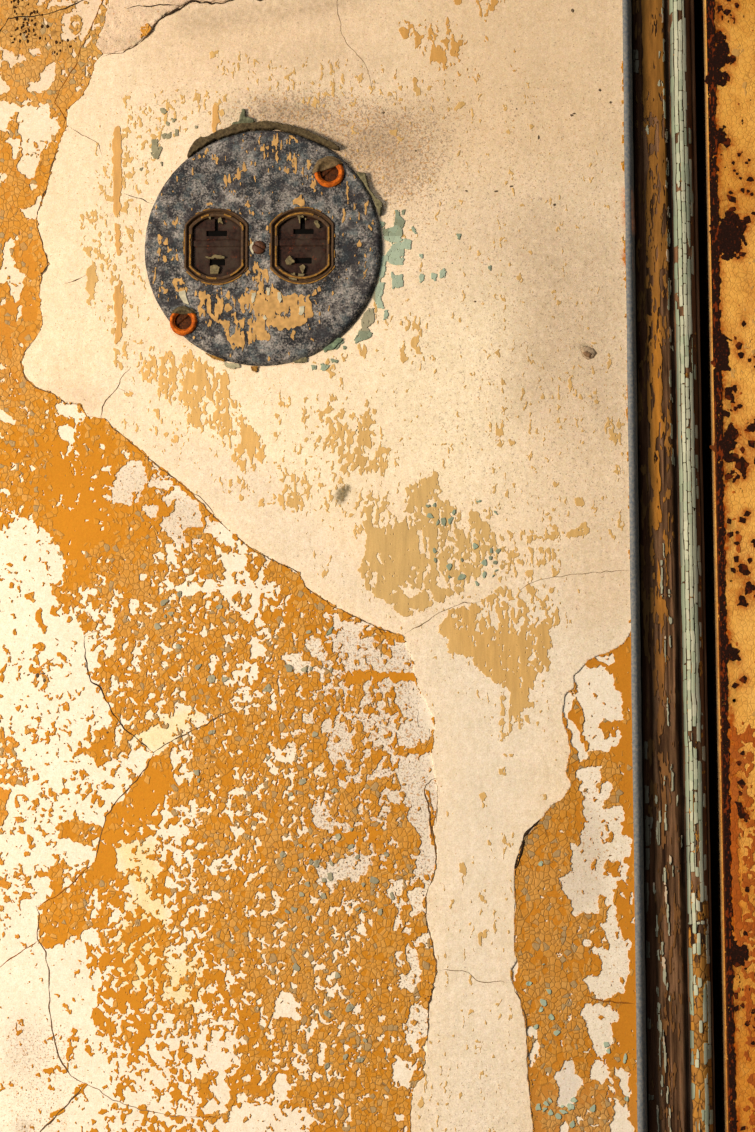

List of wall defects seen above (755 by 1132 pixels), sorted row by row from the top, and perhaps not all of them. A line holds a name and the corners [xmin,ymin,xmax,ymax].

crack [0,0,262,296]
crack [337,0,371,82]
peeling [0,0,488,1132]
crack [20,341,477,636]
peeling [79,87,629,742]
peeling [448,0,713,1132]
rust [705,0,755,1132]
crack [0,629,232,1132]
crack [424,778,534,1130]
crack [514,818,543,911]
crack [588,996,633,1004]